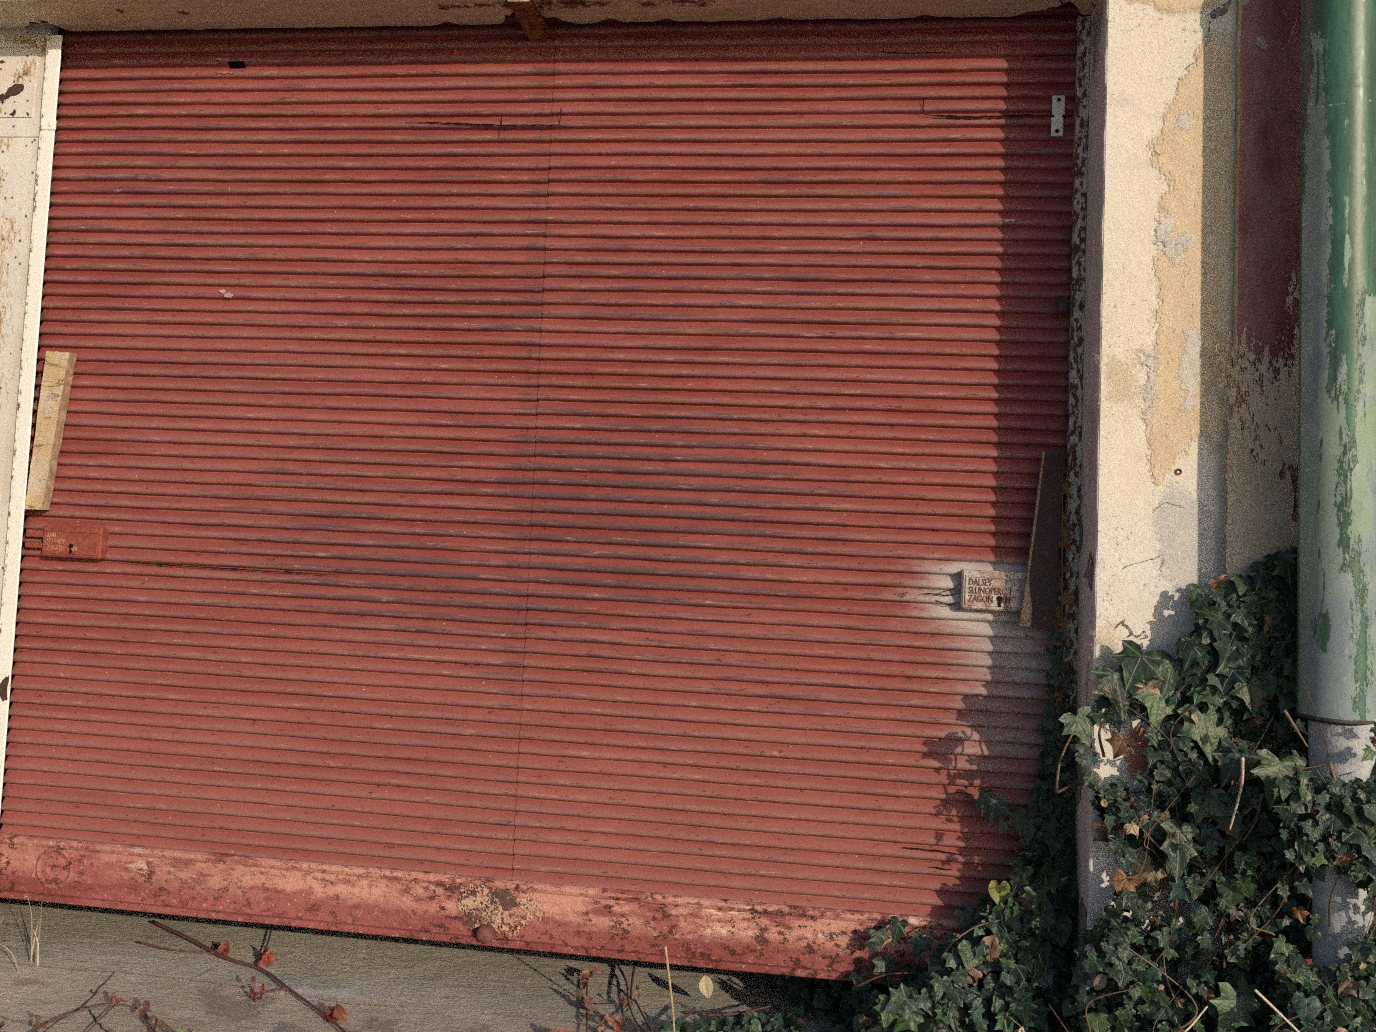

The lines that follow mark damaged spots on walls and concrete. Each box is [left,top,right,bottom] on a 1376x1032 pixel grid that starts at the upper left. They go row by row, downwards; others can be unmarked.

rust [0,31,47,84]
rust [0,136,20,394]
peeling [1107,0,1299,580]